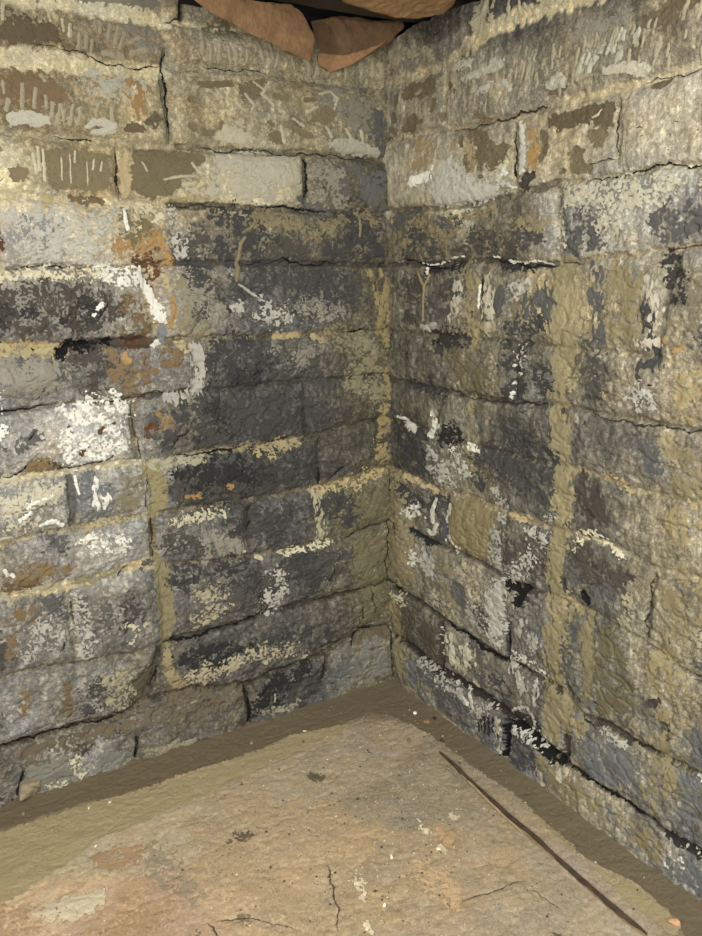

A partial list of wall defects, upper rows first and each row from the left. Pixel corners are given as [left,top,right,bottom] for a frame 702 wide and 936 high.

crack [30,39,170,146]
crack [113,153,121,192]
crack [199,147,375,213]
leakage [407,171,432,203]
corrosion [109,229,180,290]
crack [495,258,584,270]
leakage [14,425,46,456]
leakage [629,426,702,553]
leakage [2,559,77,590]
leakage [75,531,135,560]
leakage [77,665,137,739]
crack [328,867,340,932]